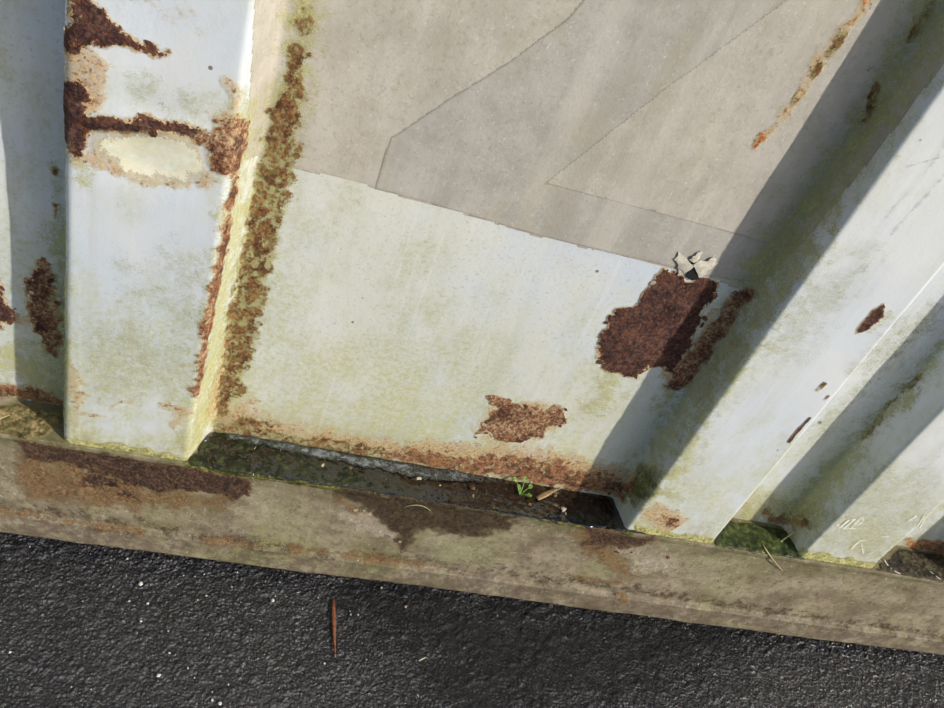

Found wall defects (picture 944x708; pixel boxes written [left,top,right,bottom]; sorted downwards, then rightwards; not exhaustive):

corrosion [753,0,872,149]
corrosion [63,0,640,502]
corrosion [0,257,98,417]
corrosion [585,251,756,417]
corrosion [856,303,893,334]
corrosion [862,373,923,440]
damp [331,485,517,551]
corrosion [530,503,824,621]
corrosion [742,495,818,539]
corrosion [905,538,944,557]